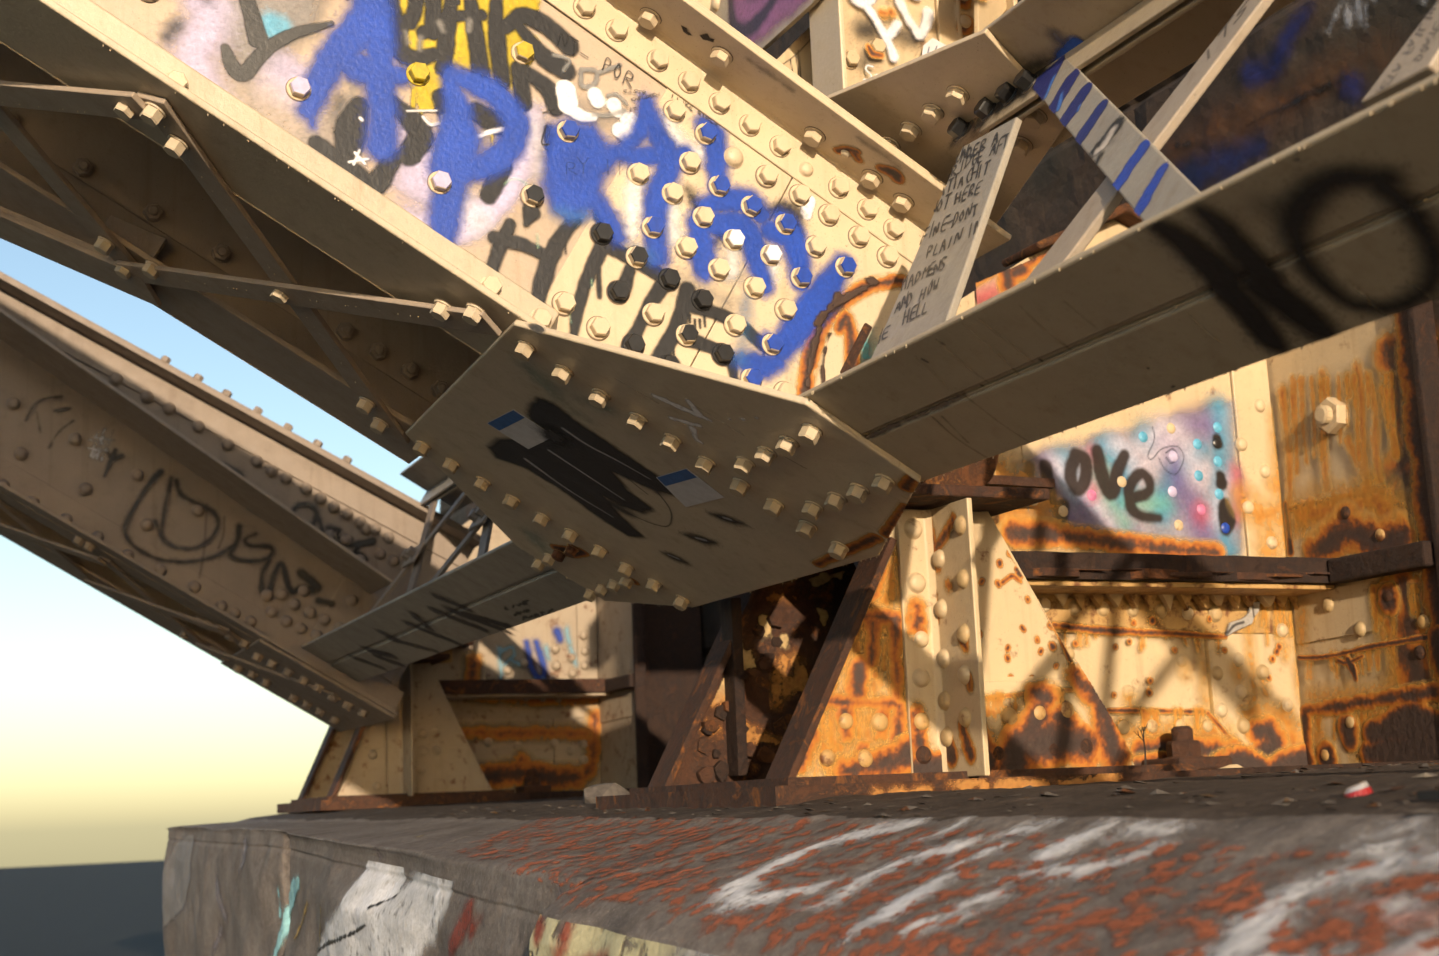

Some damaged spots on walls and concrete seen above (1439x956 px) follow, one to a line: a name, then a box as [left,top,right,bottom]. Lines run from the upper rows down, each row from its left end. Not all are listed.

rust [996,459,1030,477]
rust [1240,310,1433,578]
rust [463,652,483,680]
rust [797,474,1439,795]
rust [460,697,602,791]